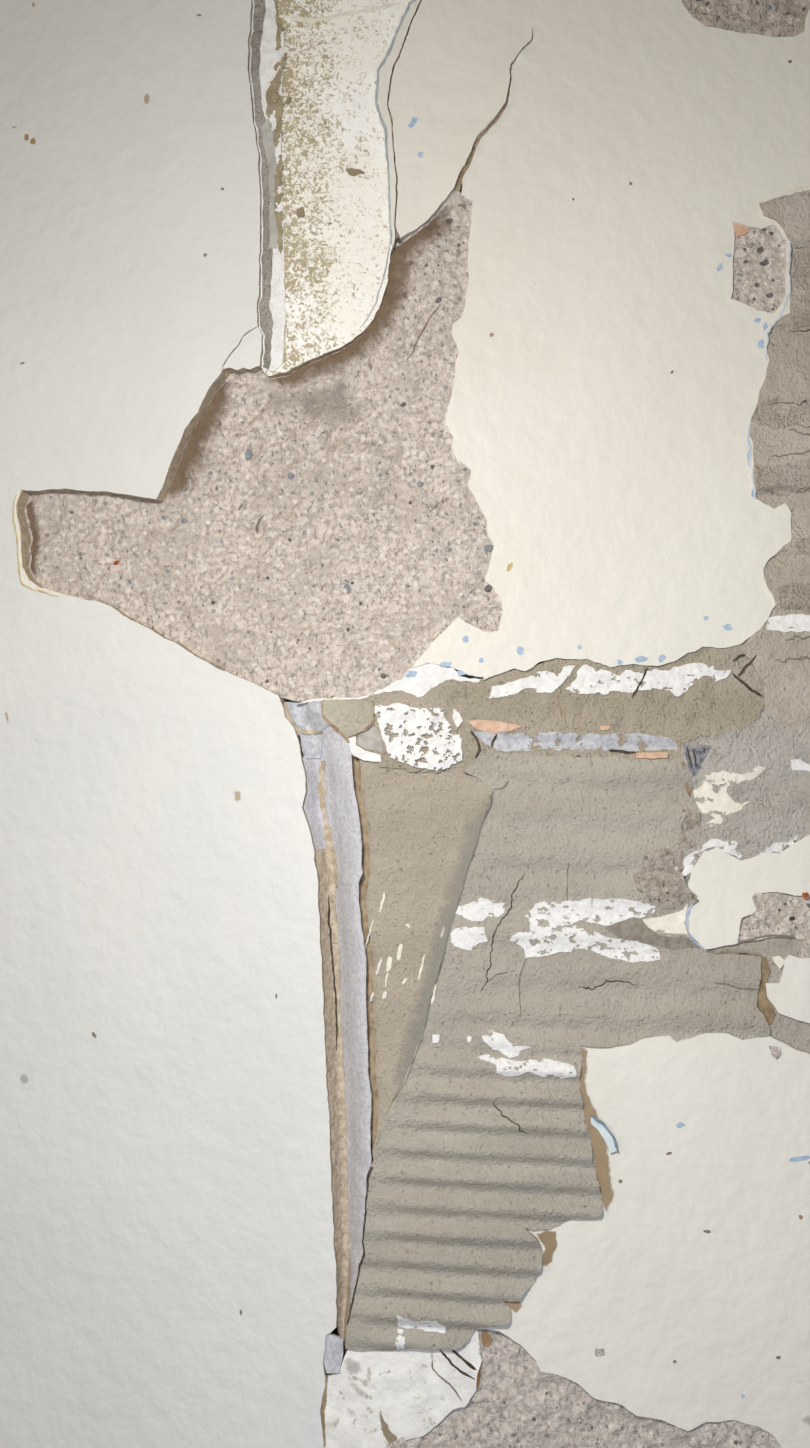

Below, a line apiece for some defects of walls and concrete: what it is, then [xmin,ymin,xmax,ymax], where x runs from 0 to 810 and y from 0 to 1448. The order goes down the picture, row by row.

spalling [681,0,810,37]
crack [454,29,533,191]
spalling [717,222,786,349]
spalling [12,0,502,702]
spalling [737,892,810,969]
peeling [590,1116,618,1153]
spalling [387,1329,782,1448]